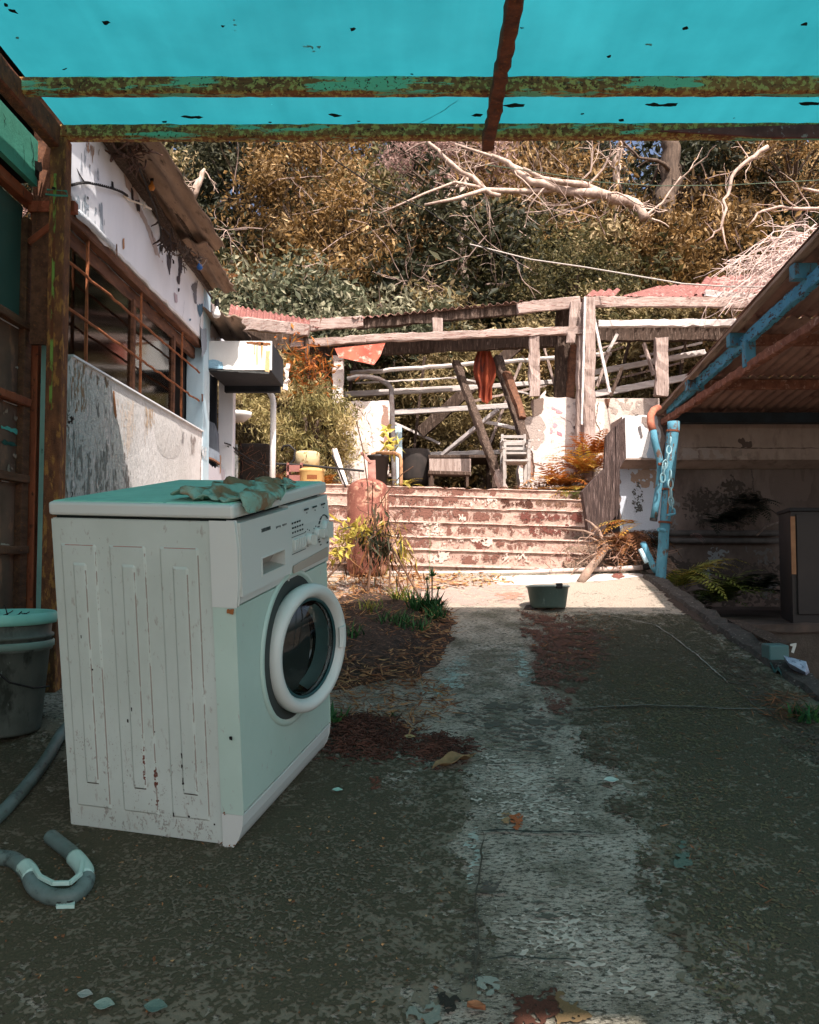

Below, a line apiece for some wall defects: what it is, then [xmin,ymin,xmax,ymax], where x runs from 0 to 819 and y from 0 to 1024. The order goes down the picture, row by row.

peeling [458,496,497,521]
peeling [327,521,690,616]